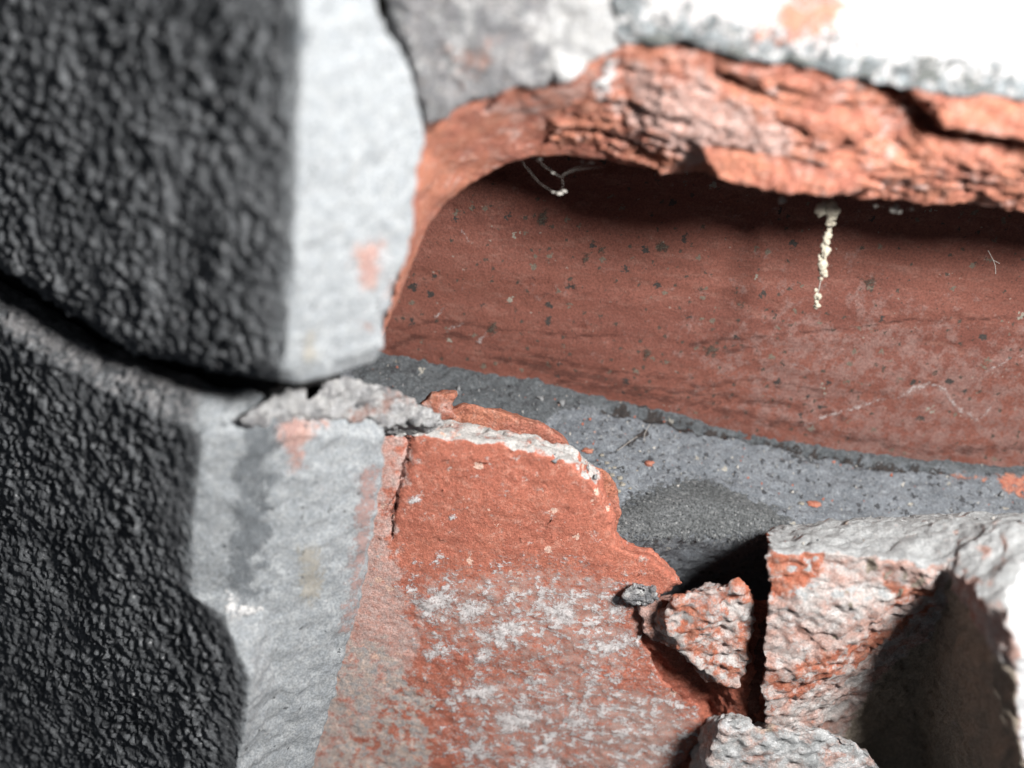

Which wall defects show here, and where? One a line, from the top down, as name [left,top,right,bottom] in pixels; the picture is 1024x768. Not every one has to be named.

spalling [380,42,1024,467]
crack [389,435,412,538]
efflorescence [394,550,698,768]
crack [746,620,767,724]